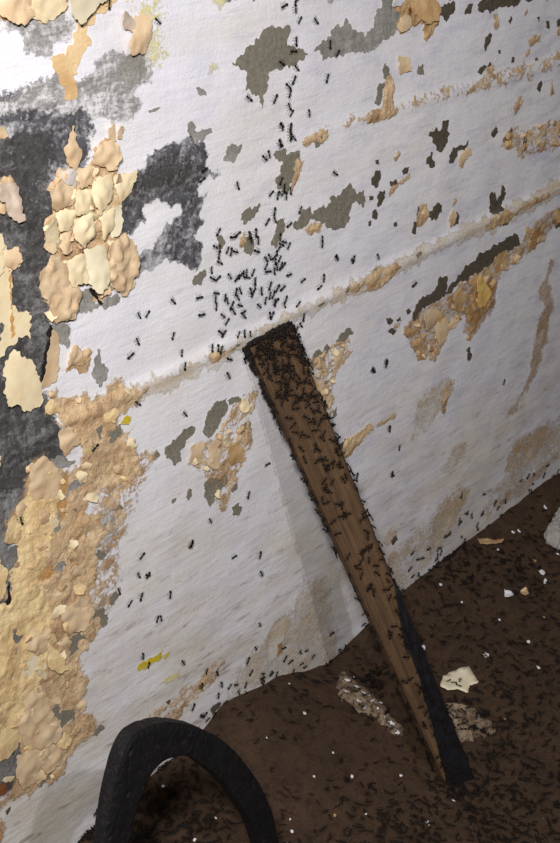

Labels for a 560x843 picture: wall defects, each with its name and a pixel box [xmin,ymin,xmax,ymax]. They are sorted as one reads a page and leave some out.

damp [0,81,96,186]
peeling [0,0,117,100]
peeling [116,0,168,87]
peeling [232,0,532,108]
peeling [367,55,424,124]
peeling [491,120,560,160]
damp [122,155,196,221]
spalling [412,198,459,234]
spalling [489,185,513,226]
peeling [386,207,560,362]
peeling [308,328,353,418]
peeling [0,121,261,800]